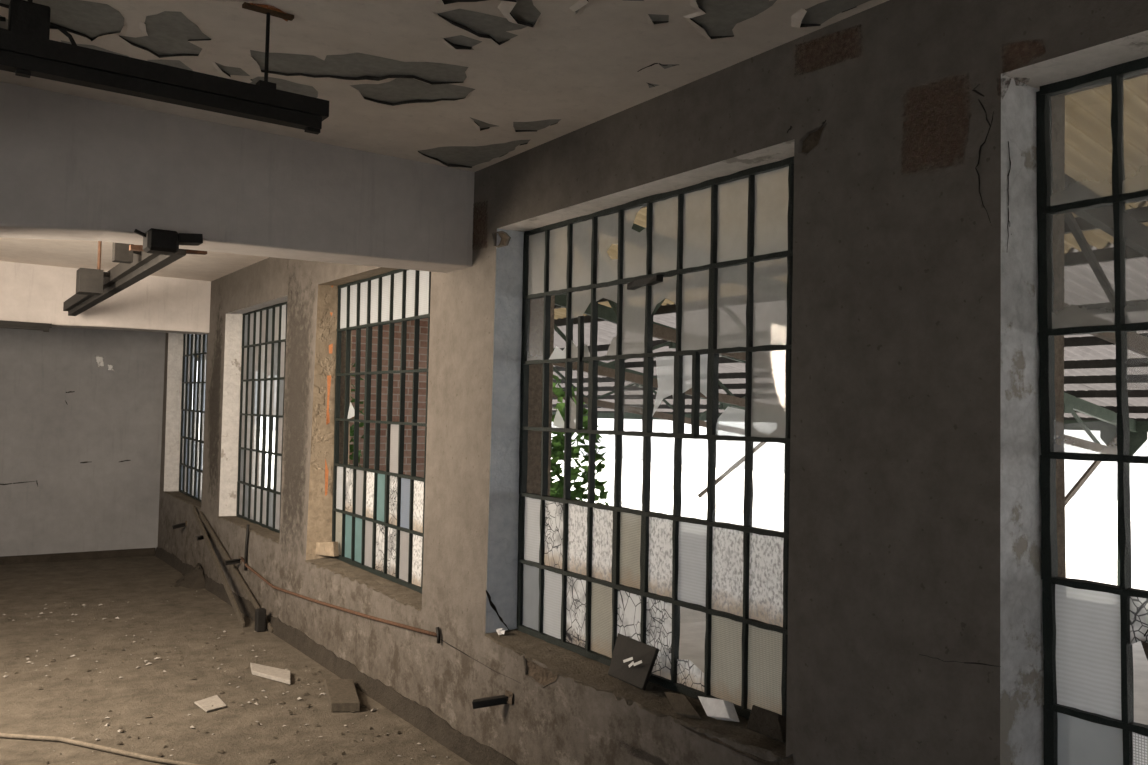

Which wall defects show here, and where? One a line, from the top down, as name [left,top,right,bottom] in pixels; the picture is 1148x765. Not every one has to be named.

peeling [434,0,541,50]
peeling [24,0,475,106]
peeling [416,117,561,168]